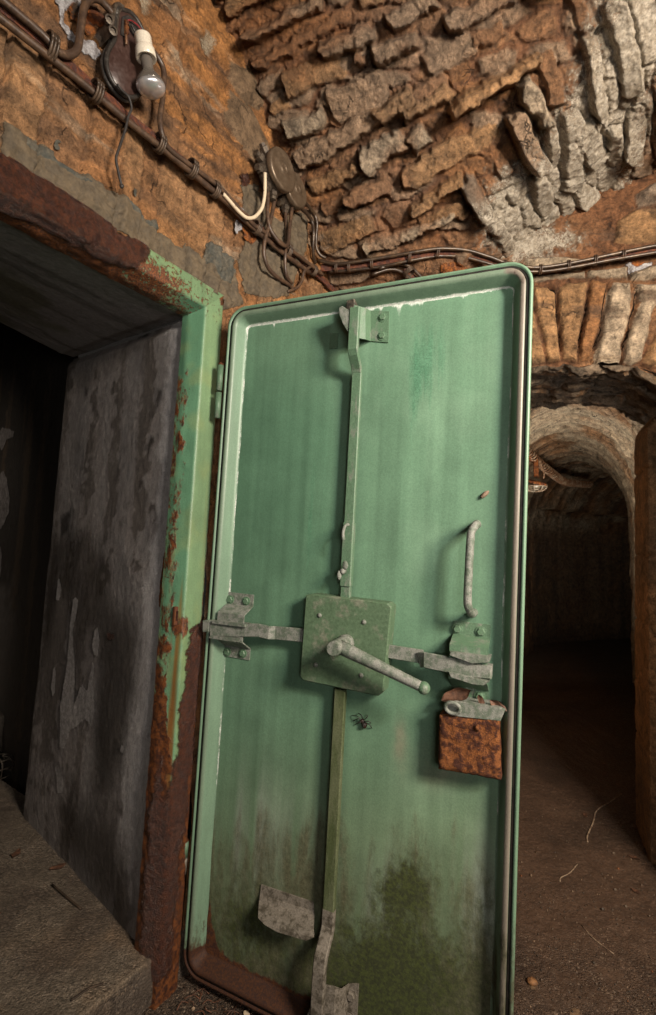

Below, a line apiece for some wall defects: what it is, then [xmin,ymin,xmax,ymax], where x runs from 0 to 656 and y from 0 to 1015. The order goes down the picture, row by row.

corrosion [0,152,150,270]
peeling [0,471,9,529]
damp [47,511,131,790]
corrosion [139,620,203,983]